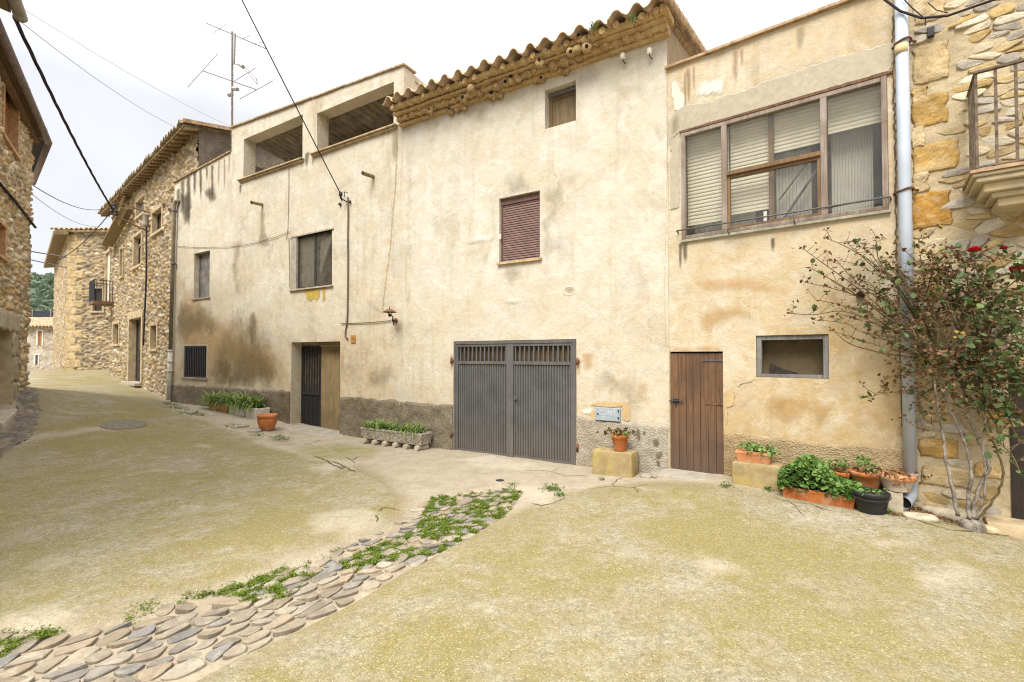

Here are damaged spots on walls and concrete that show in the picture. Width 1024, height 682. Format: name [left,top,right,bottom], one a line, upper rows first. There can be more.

peeling [666,76,685,110]
peeling [699,79,724,95]
leakage [177,165,219,220]